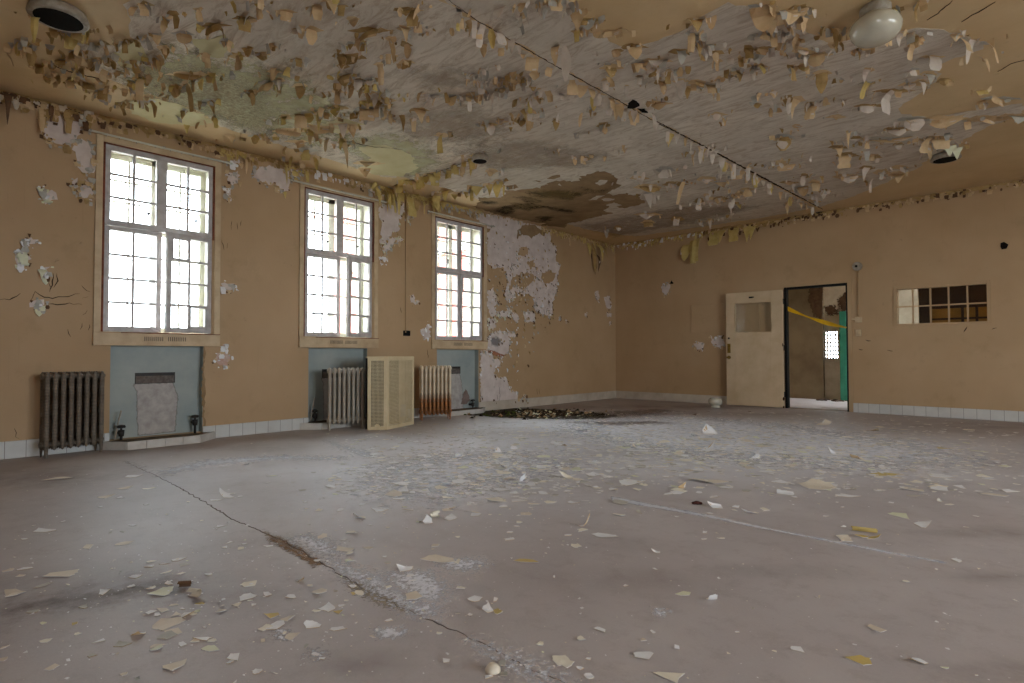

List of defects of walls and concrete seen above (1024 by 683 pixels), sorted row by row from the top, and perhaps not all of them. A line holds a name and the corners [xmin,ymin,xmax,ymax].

crack [0,275,90,337]
peeling [201,344,234,426]
peeling [0,0,1024,404]
crack [125,462,565,683]